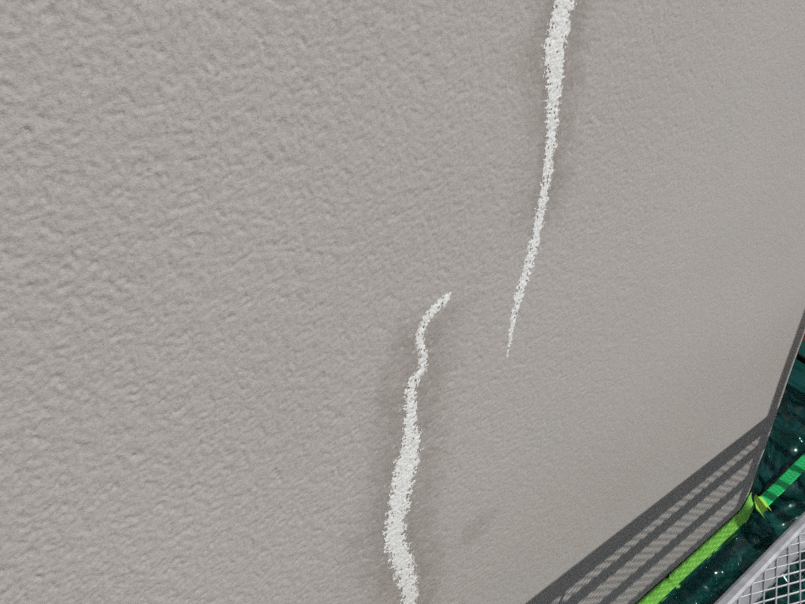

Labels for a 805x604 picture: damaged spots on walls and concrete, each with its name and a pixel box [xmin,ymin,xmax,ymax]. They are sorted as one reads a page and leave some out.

crack [507,0,577,357]
crack [382,292,451,604]